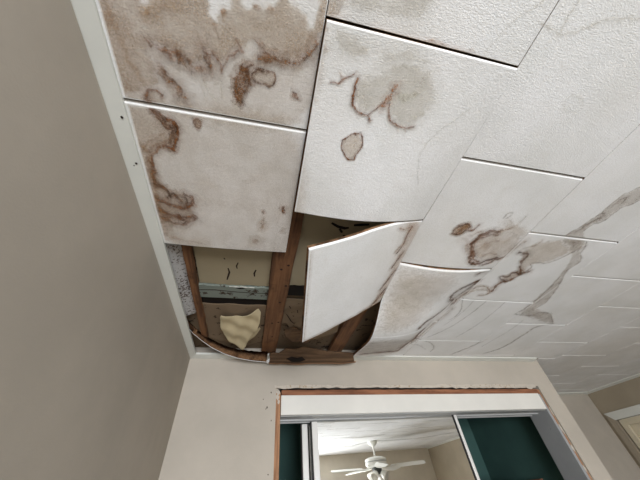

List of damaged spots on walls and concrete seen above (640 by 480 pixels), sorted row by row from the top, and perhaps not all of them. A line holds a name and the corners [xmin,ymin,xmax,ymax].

damp [162,41,240,71]
damp [233,36,319,103]
damp [330,73,414,129]
damp [144,89,198,225]
damp [452,223,509,265]
damp [450,248,532,301]
spalling [166,243,356,365]